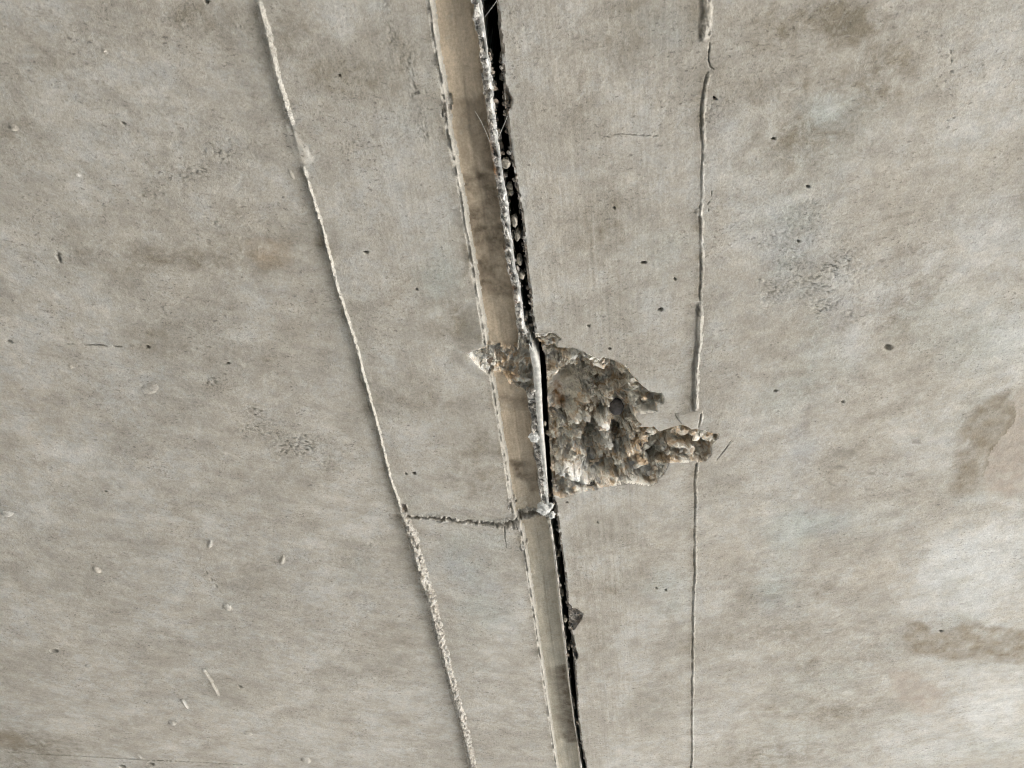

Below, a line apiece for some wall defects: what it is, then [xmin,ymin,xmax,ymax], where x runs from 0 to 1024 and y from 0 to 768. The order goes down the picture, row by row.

crack [706,41,715,70]
spalling [467,0,719,517]
leakage [940,384,1024,500]
crack [403,506,550,551]
leakage [901,618,1024,667]